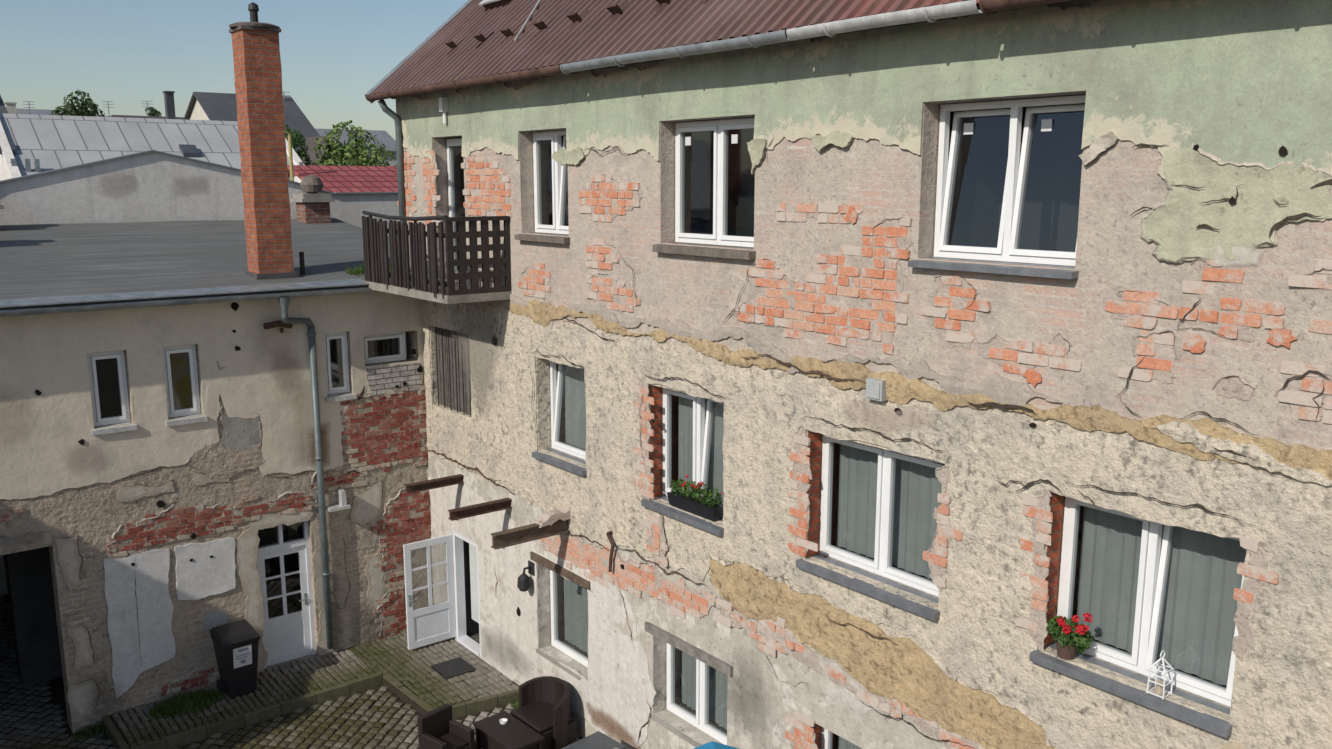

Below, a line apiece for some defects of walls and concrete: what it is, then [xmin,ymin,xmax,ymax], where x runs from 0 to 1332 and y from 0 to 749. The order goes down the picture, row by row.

flaking render [397,149,441,231]
flaking render [461,155,511,217]
peeling [747,138,768,175]
peeling [1078,131,1119,166]
crack [1311,179,1332,189]
flaking render [518,262,551,298]
flaking render [579,173,642,313]
flaking render [729,200,1082,387]
peeling [1105,143,1332,424]
flaking render [106,349,431,640]
crack [997,479,1256,526]
flaking render [540,377,1055,749]